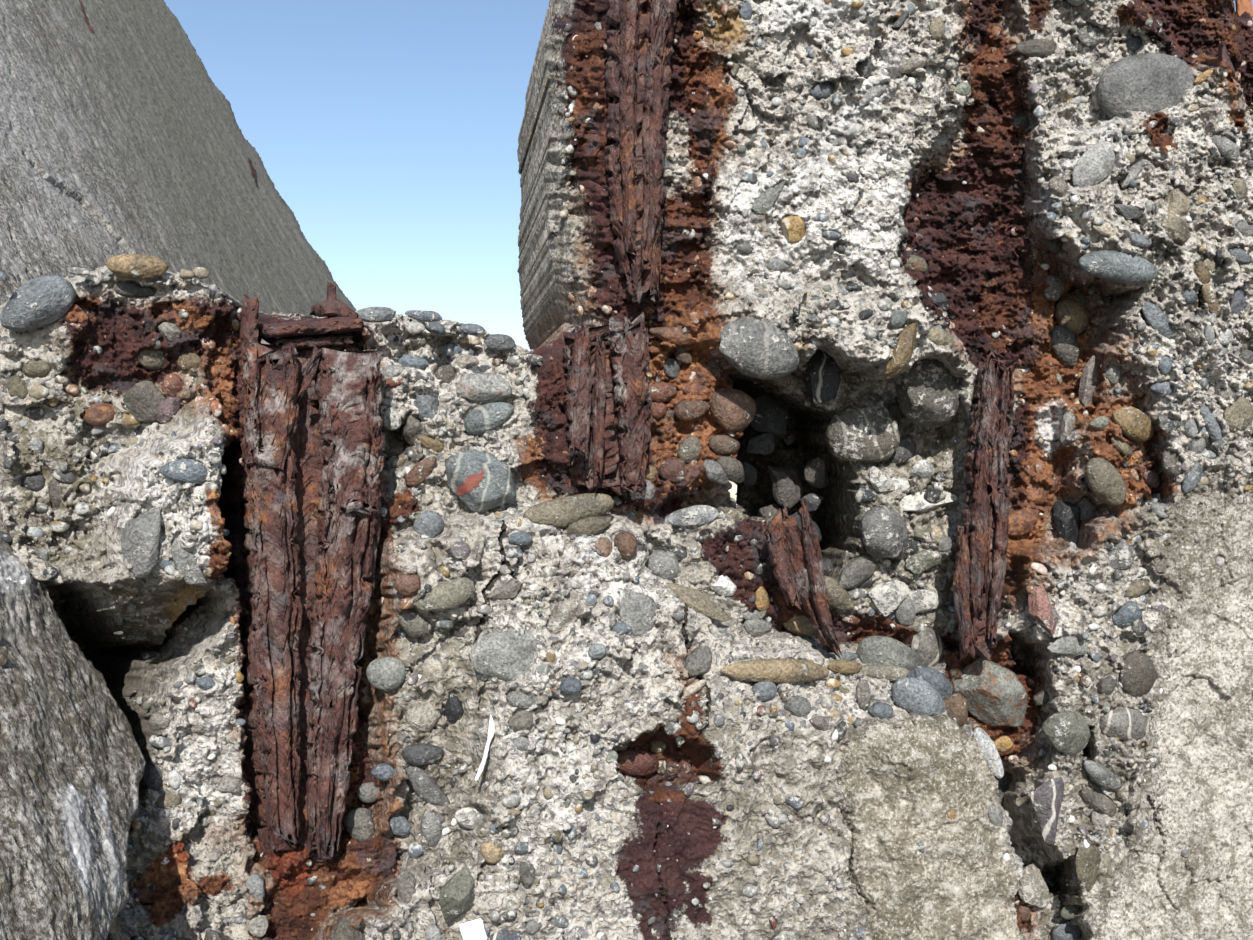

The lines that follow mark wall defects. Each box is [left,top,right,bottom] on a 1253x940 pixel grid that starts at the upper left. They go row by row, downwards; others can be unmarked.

rust [515,0,745,524]
spalling [382,425,421,469]
spalling [732,379,862,566]
rust [899,0,1179,762]
spalling [57,589,213,800]
rust [62,291,423,940]
crack [474,520,517,641]
crack [672,579,711,736]
rust [700,498,920,659]
crack [655,801,672,940]
rust [614,679,730,940]
crack [840,810,874,905]